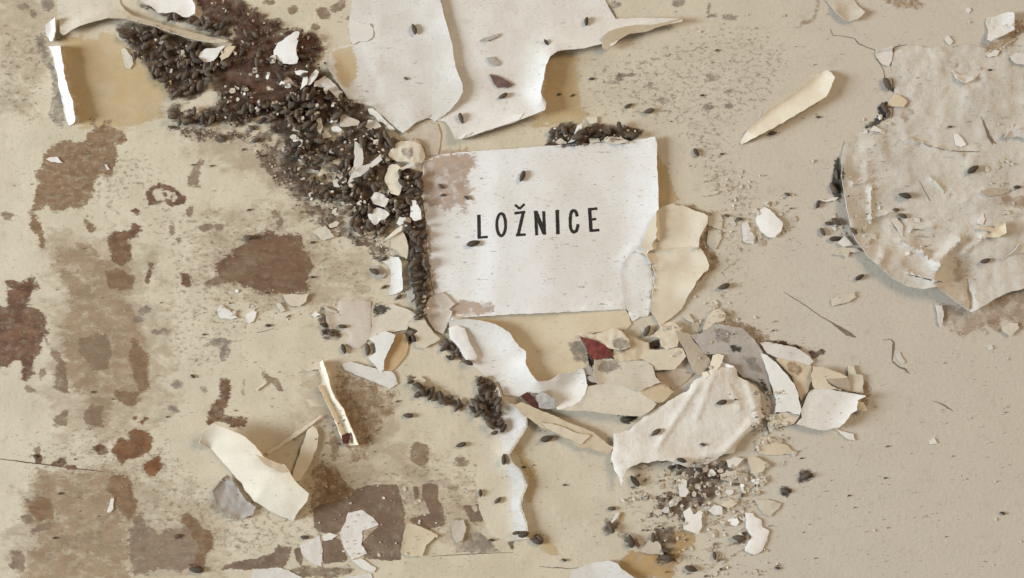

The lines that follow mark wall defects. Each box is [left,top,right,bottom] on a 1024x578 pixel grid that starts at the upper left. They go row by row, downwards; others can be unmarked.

peeling [45,0,236,133]
peeling [300,0,683,196]
peeling [820,12,1024,327]
water stain [0,119,204,430]
water stain [205,229,314,295]
water stain [206,378,247,429]
water stain [262,372,283,391]
peeling [311,195,851,562]
water stain [9,453,213,578]
peeling [300,502,381,578]
peeling [570,560,635,578]